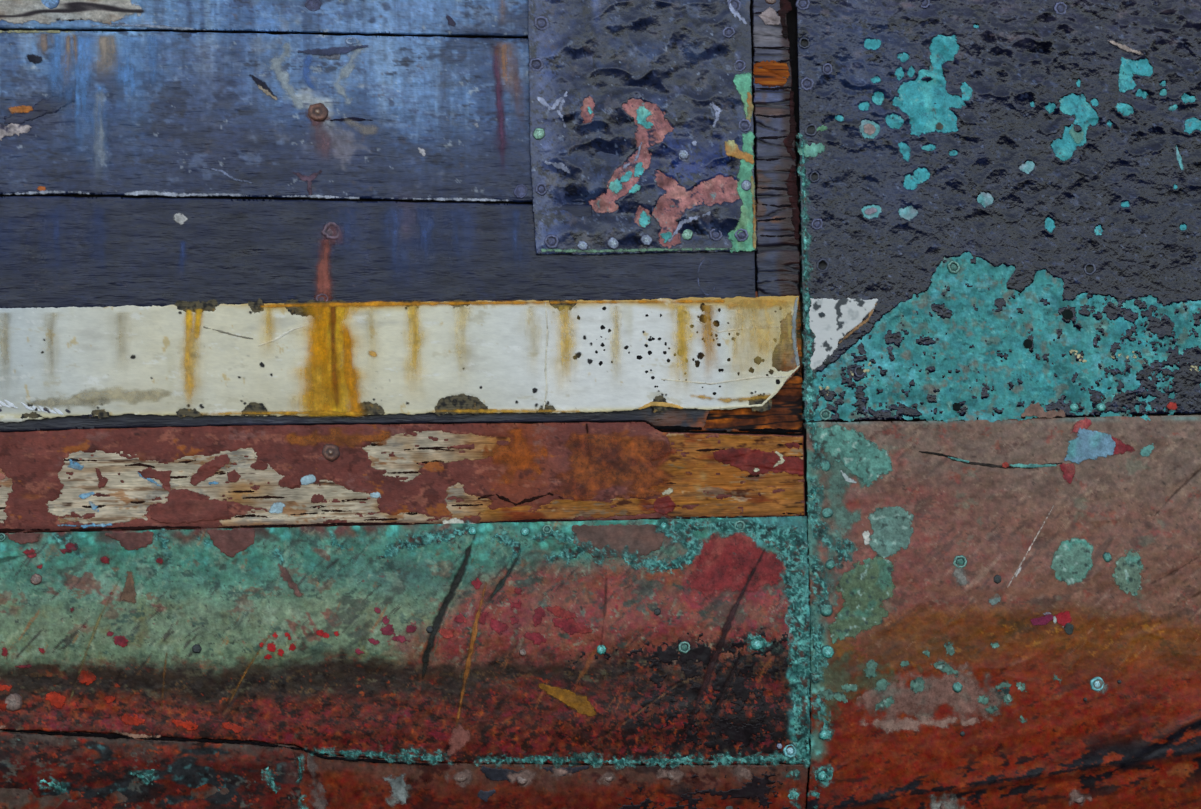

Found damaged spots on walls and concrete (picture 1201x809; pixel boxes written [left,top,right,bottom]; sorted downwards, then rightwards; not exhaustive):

peeling [0,0,144,24]
peeling [858,35,973,190]
peeling [537,73,757,253]
rust [185,309,202,393]
rust [218,227,617,446]
peeling [47,252,1201,558]
rust [676,300,724,365]
rust [704,298,803,430]
peeling [688,532,783,599]
peeling [1051,538,1094,585]
rust [538,683,596,717]
crack [0,725,429,765]